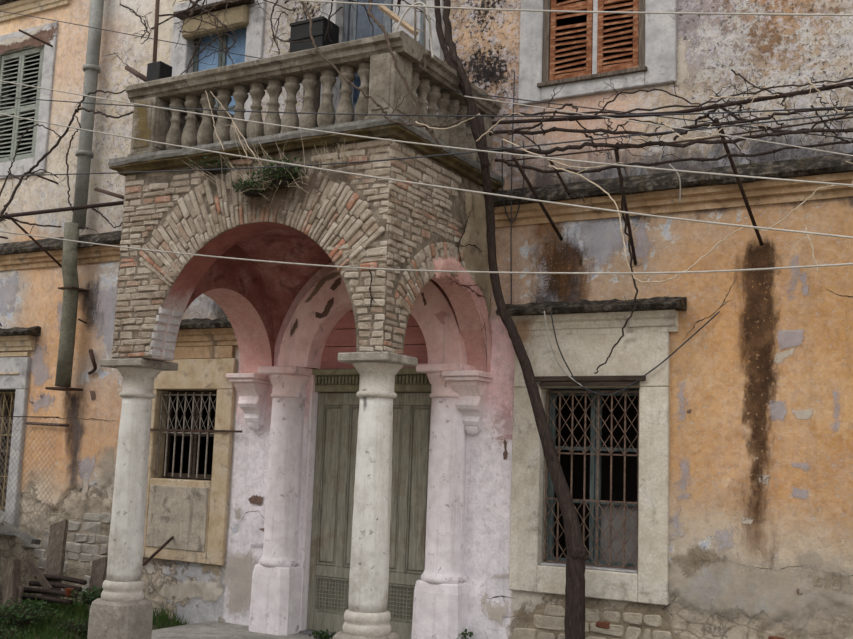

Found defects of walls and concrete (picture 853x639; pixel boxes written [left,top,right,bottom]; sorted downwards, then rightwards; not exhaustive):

peeling [741,0,796,60]
leakage [536,237,585,303]
peeling [306,272,341,318]
peeling [774,329,804,363]
leakage [742,241,779,543]
peeling [770,401,813,420]
leakage [66,392,83,483]
peeling [248,495,264,505]
crack [727,560,853,585]